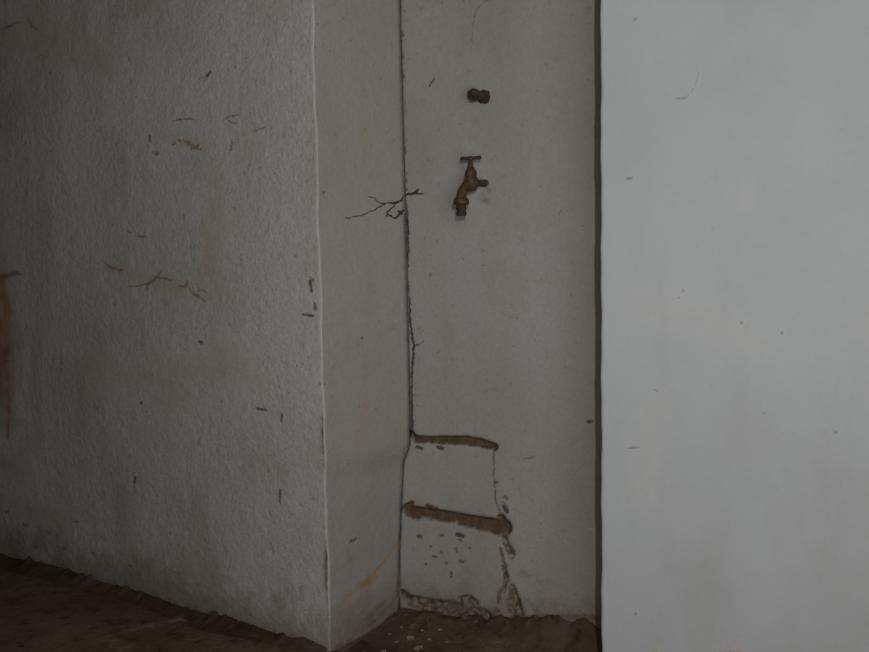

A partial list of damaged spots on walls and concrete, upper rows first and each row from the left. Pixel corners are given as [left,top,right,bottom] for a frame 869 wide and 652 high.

crack [346,178,425,462]
flaking render [411,431,499,452]
flaking render [399,501,523,620]